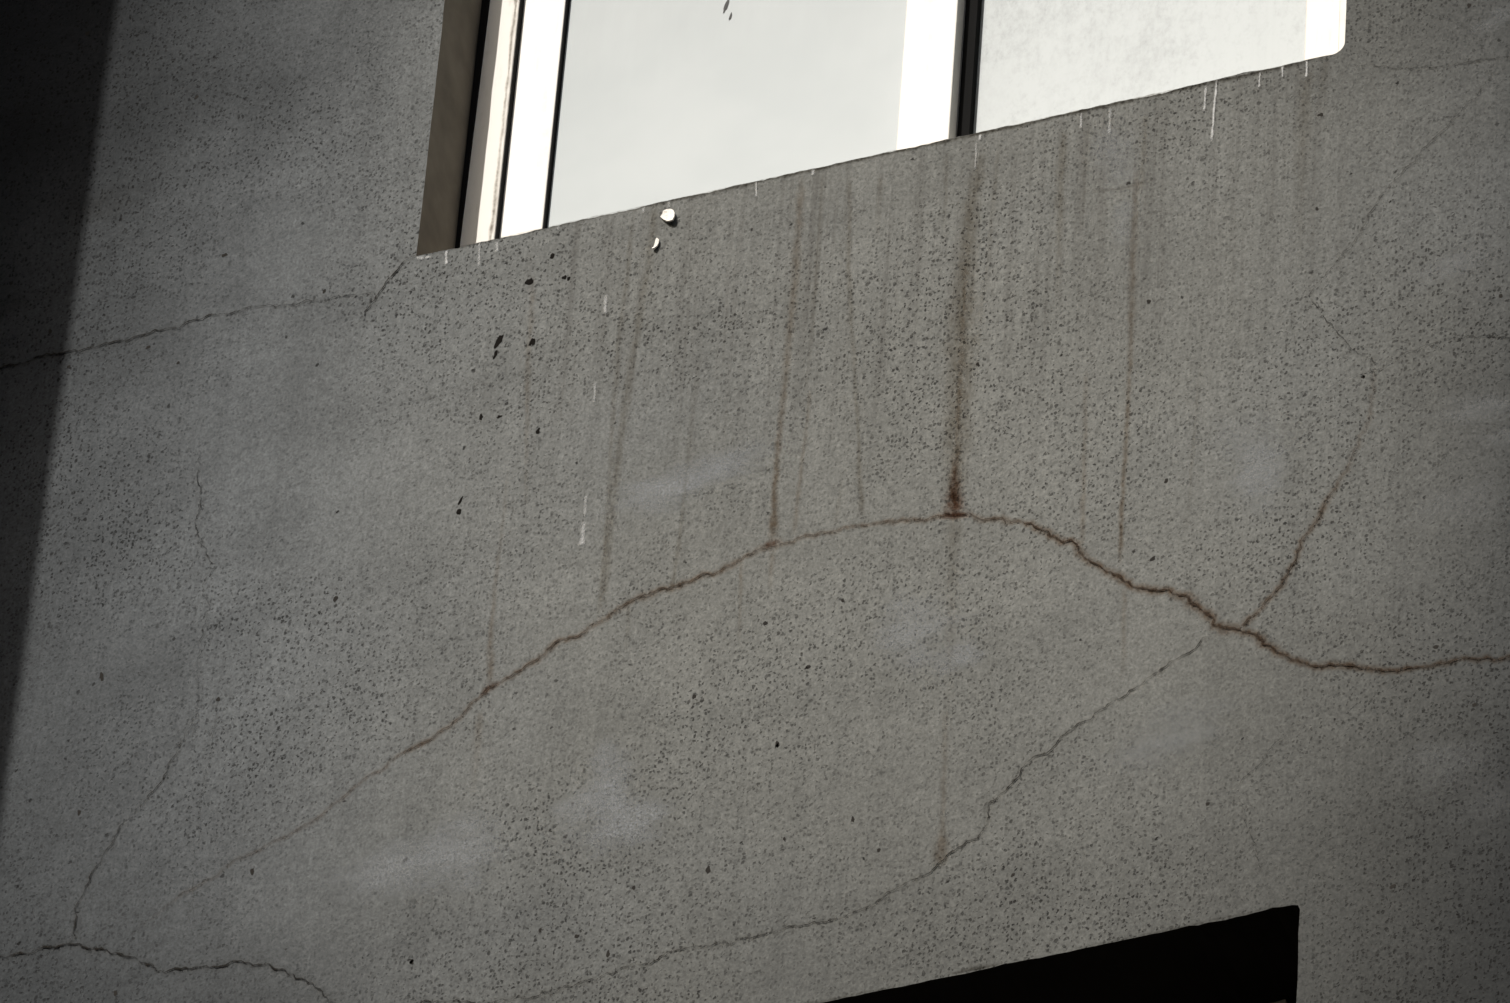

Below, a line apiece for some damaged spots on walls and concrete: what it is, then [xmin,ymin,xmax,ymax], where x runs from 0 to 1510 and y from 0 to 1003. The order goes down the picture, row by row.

crack [0,299,312,369]
crack [421,495,1510,1003]
crack [0,826,326,997]